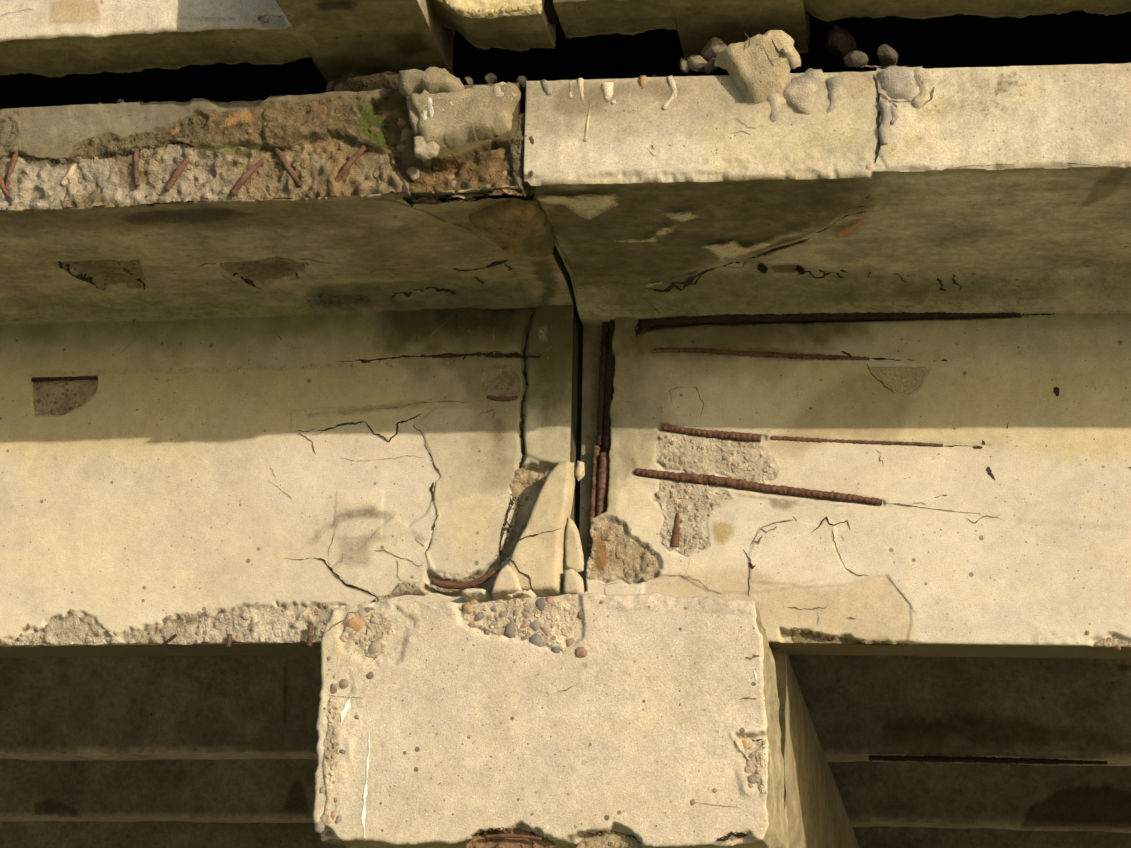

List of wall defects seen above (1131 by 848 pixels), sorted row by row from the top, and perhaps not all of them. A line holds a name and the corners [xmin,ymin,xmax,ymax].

spalling [473,82,517,97]
spalling [0,91,535,214]
water stain [131,210,241,223]
spalling [31,376,98,416]
crack [295,197,562,591]
spalling [585,320,943,584]
spalling [0,466,587,658]
crack [283,535,377,634]
crack [594,516,917,616]
spalling [1085,630,1131,651]
spalling [314,656,349,836]